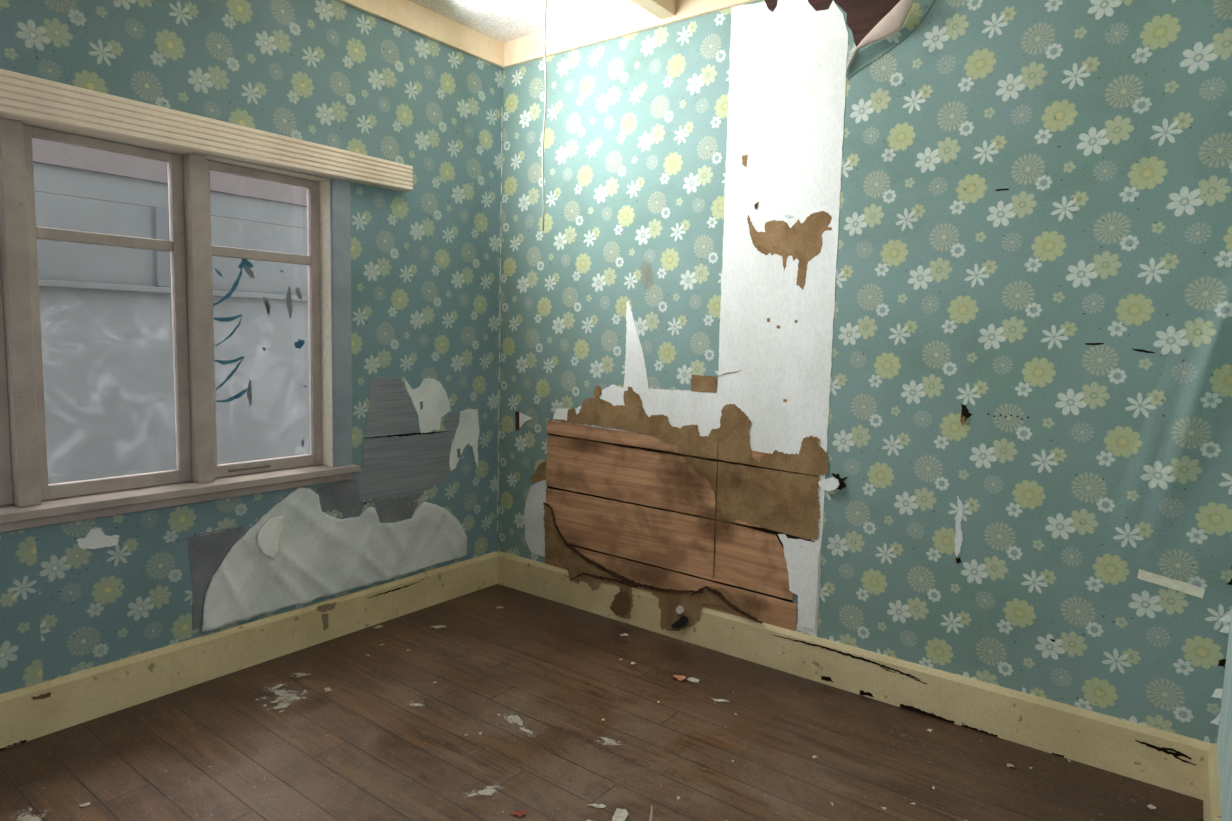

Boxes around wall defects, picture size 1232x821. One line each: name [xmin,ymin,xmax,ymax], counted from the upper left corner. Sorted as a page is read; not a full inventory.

peeling [599,0,848,454]
peeling [317,376,480,522]
peeling [552,406,648,435]
peeling [797,474,825,637]
crack [1135,740,1196,765]